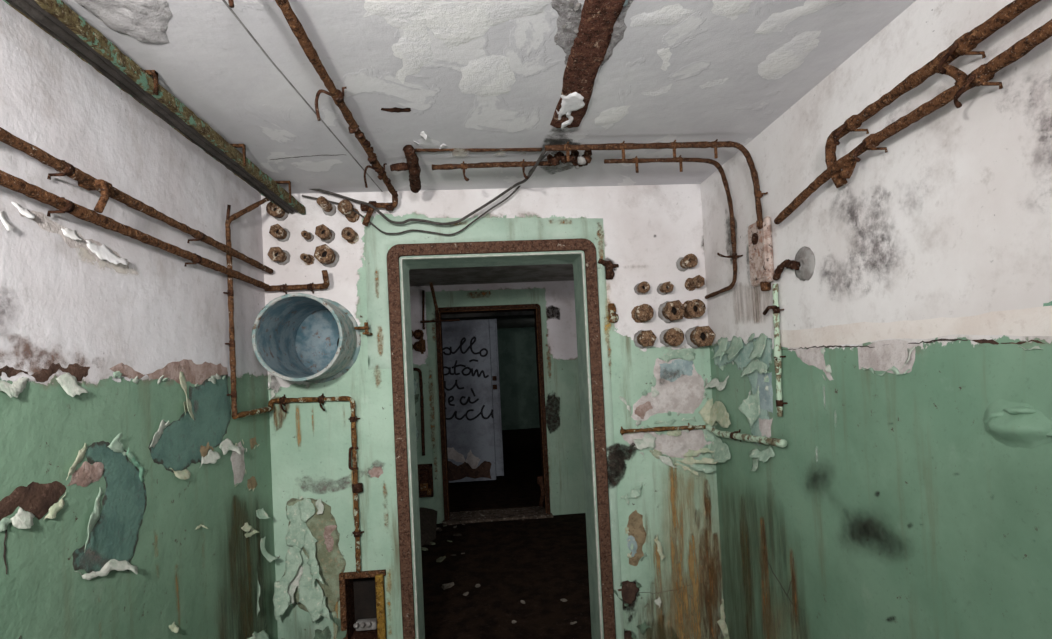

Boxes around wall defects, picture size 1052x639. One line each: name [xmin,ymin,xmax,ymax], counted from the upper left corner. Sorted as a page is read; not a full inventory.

peeling [363,0,582,84]
peeling [0,202,128,265]
leakage [859,205,890,268]
peeling [619,333,775,476]
peeling [789,347,833,381]
peeling [858,339,916,376]
spalling [968,339,1047,350]
peeling [0,359,260,580]
peeling [241,496,347,639]
corrosion [654,465,722,639]
corrosion [740,504,770,639]
peeling [717,598,730,639]